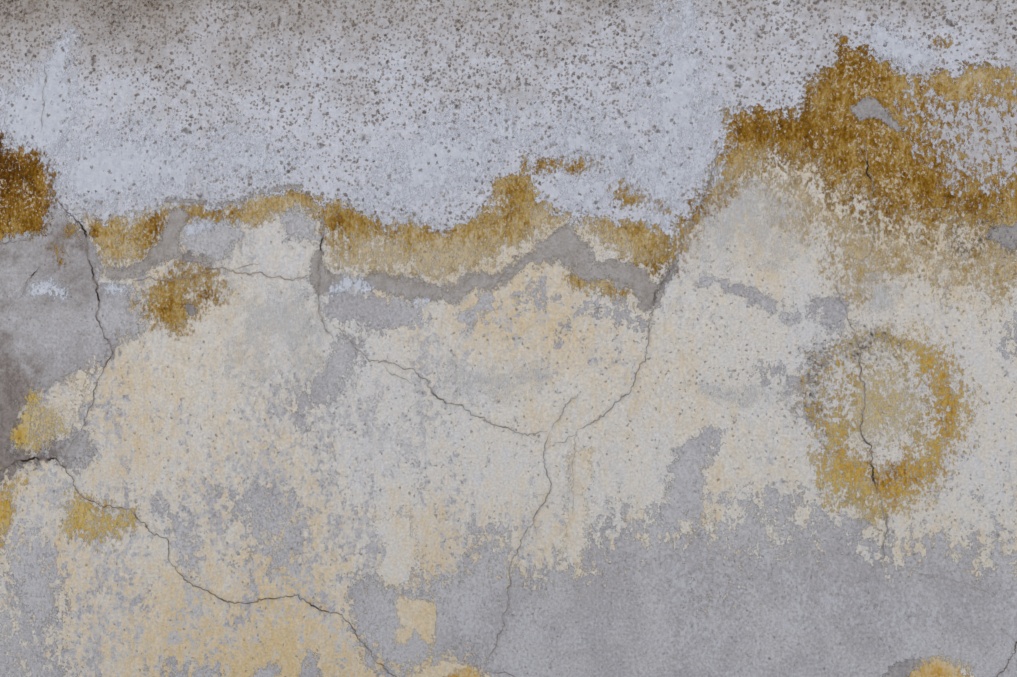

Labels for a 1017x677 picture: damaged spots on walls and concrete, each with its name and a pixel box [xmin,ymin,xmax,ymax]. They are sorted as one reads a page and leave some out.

water stain [0,26,327,236]
flaking render [0,0,1017,432]
water stain [328,0,803,268]
water stain [861,20,1017,261]
crack [0,172,396,677]
crack [136,146,722,677]
peeling [335,425,1017,677]
water stain [781,318,987,525]
crack [836,140,992,596]